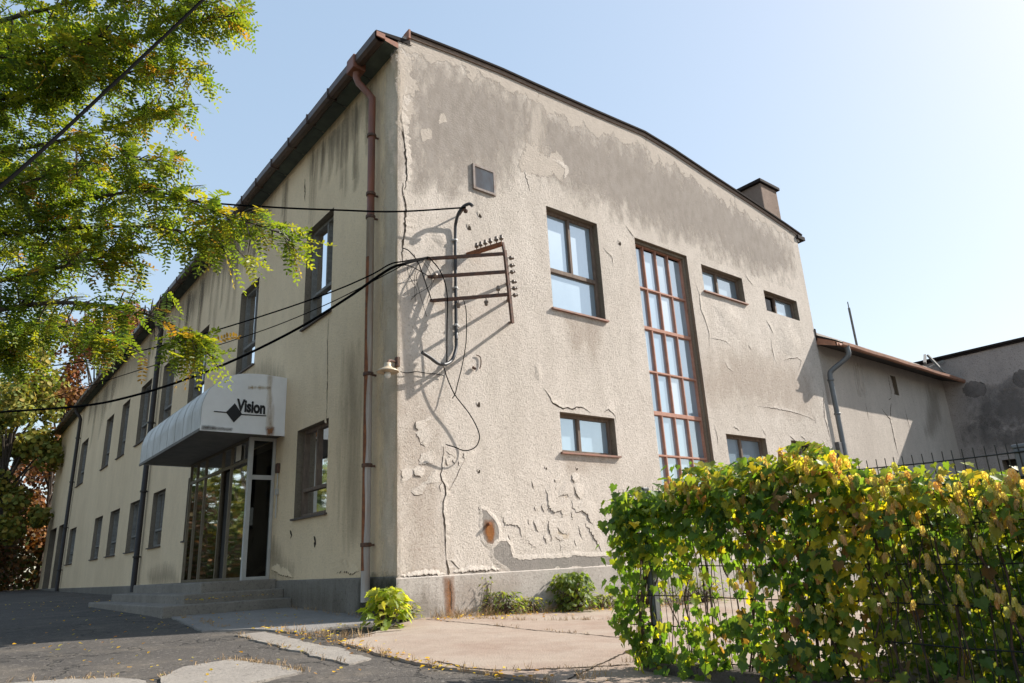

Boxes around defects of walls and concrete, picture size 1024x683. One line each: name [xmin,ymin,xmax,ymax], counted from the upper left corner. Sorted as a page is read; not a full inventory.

crack [401,89,418,263]
water stain [409,62,792,272]
crack [545,389,617,422]
peeling [380,40,795,578]
corrosion [445,581,453,614]
crack [428,446,632,679]